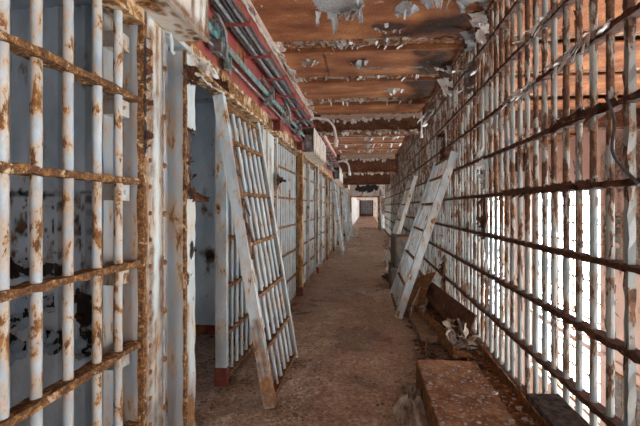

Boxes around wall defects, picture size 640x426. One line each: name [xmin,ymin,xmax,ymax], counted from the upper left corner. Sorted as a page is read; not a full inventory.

peeling [181,52,229,95]
peeling [247,0,499,163]
corrosion [146,77,166,166]
peeling [10,257,29,279]
peeling [43,258,62,279]
peeling [9,297,29,367]
peeling [43,292,55,313]
peeling [43,325,62,356]
peeling [74,288,92,361]
corrosion [260,361,276,407]